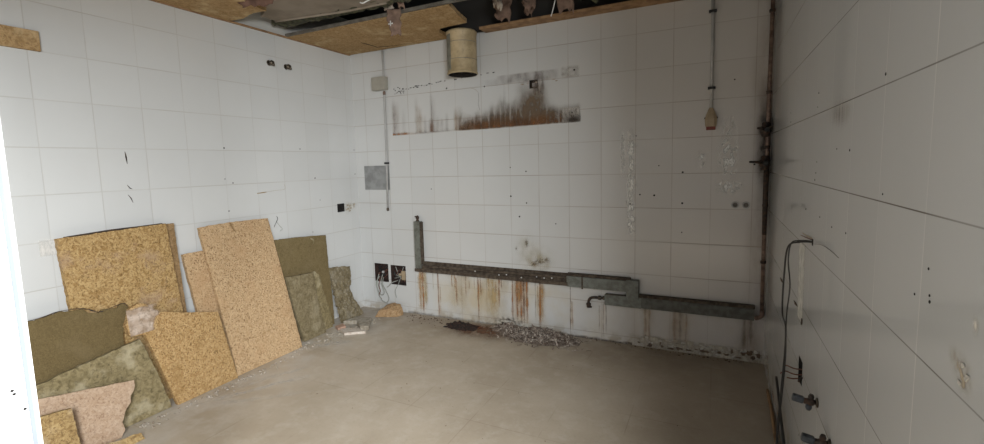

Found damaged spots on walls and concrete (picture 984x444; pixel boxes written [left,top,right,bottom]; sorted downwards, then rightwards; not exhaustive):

rust [461,118,544,130]
rust [512,281,543,318]